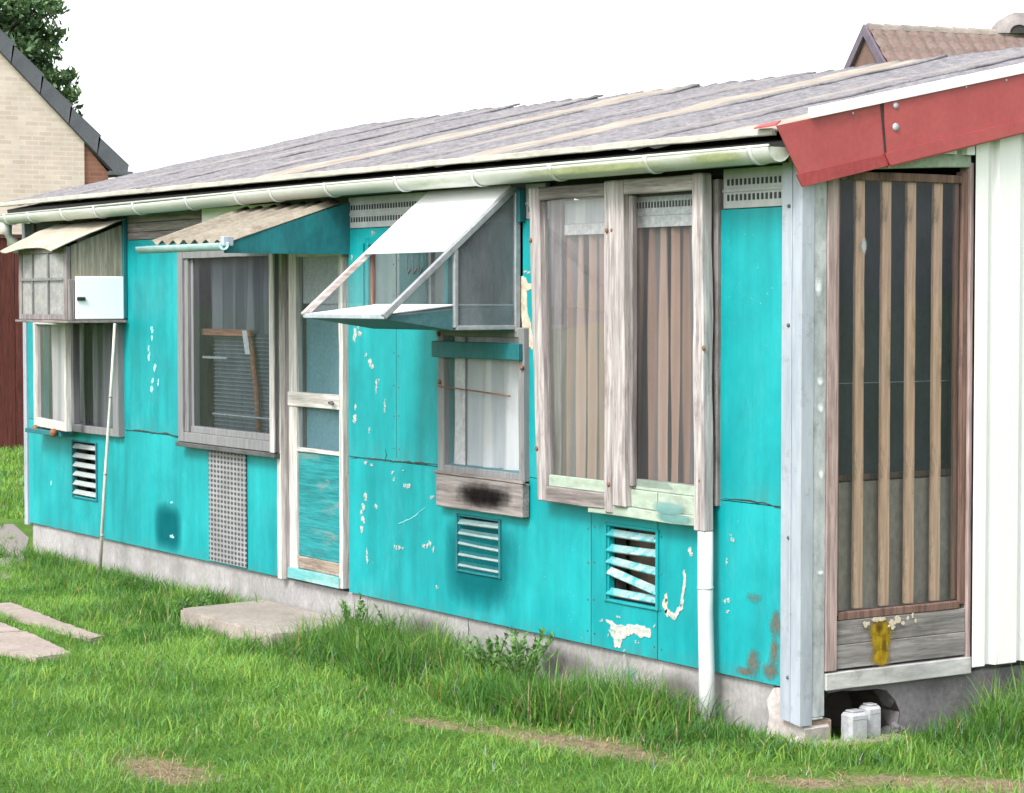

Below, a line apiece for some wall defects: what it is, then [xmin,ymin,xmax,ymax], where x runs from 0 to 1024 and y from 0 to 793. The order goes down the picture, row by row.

peeling [520,271,533,350]
crack [126,429,178,438]
damp [158,510,178,545]
peeling [360,492,378,533]
crack [724,498,780,508]
peeling [662,570,686,620]
peeling [600,615,656,657]
corrosion [739,614,780,678]
peeling [863,613,917,630]